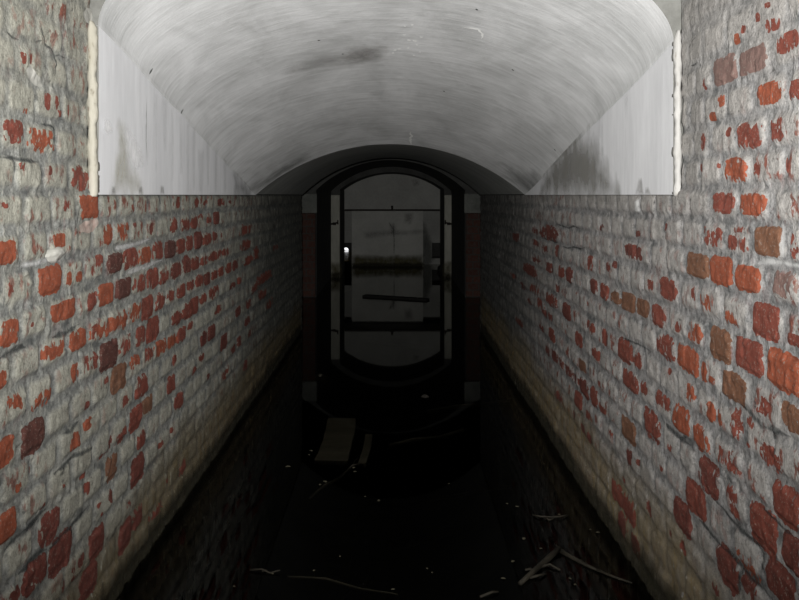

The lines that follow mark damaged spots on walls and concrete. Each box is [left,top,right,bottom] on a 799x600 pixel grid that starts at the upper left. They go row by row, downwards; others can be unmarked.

peeling [755,2,799,54]
peeling [703,25,768,121]
peeling [757,79,799,105]
peeling [3,108,54,154]
peeling [726,117,784,149]
leakage [546,141,608,191]
peeling [717,157,760,183]
peeling [713,192,768,216]
peeling [9,165,273,600]
peeling [587,225,799,556]
peeling [0,370,51,473]
peeling [712,442,799,600]